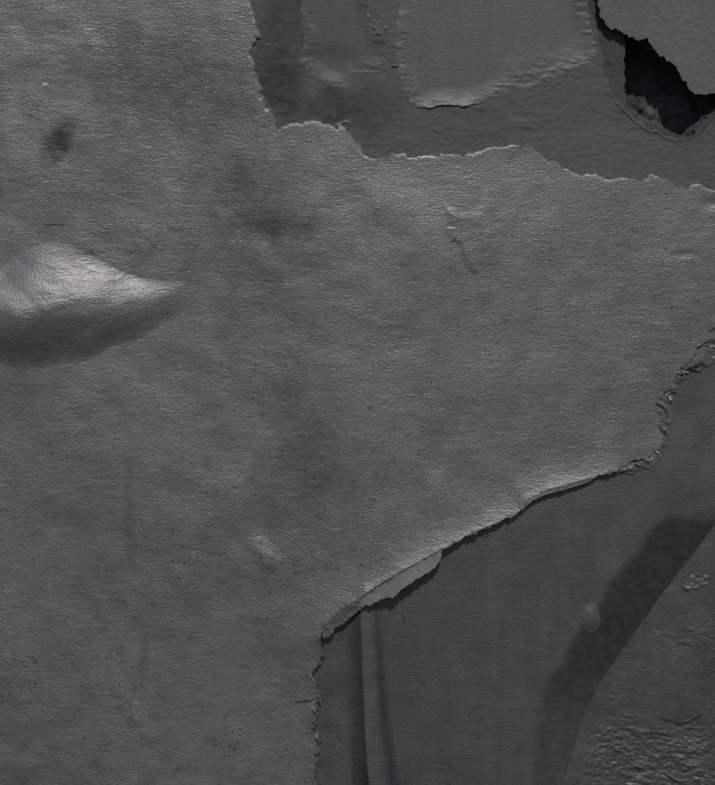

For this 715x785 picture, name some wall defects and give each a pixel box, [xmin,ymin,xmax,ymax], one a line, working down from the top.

peeling [320,601,362,637]
peeling [565,611,715,785]